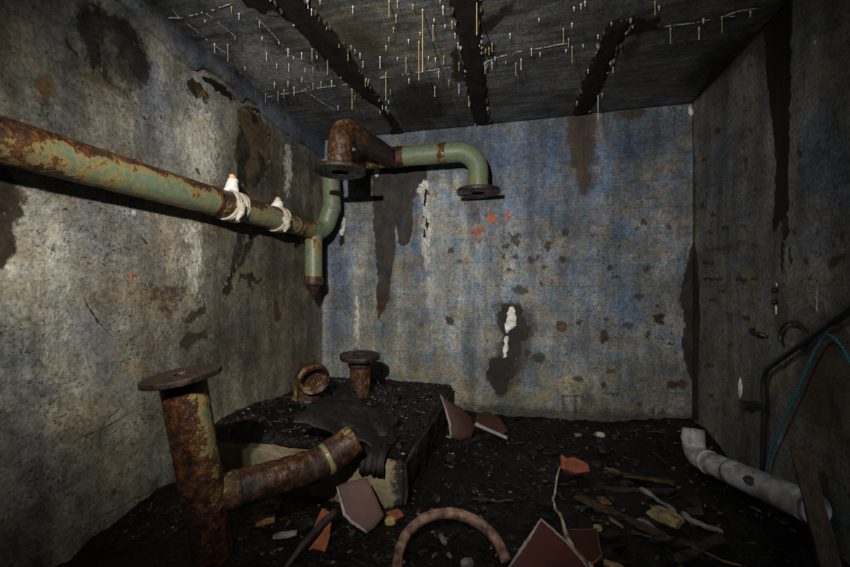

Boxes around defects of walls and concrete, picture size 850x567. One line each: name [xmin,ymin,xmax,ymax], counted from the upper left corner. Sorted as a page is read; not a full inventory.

water stain [65,2,151,97]
spalling [242,0,295,26]
peeling [591,18,634,74]
spalling [187,76,237,104]
water stain [686,0,793,274]
water stain [371,165,427,319]
rust [469,212,496,243]
spalling [503,285,528,358]